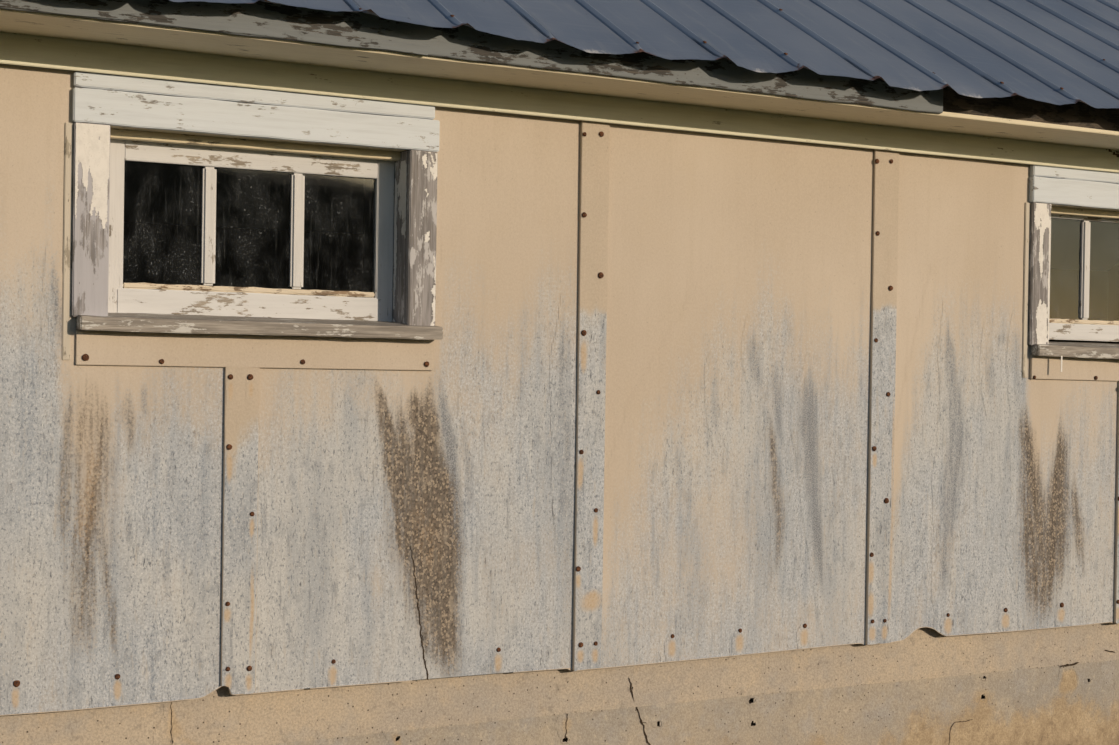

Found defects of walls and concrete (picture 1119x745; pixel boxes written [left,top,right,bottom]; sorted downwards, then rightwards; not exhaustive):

damp [42,243,154,682]
damp [371,362,481,680]
peeling [0,123,1119,715]
damp [549,291,577,556]
damp [931,301,1092,629]
crack [629,678,651,745]